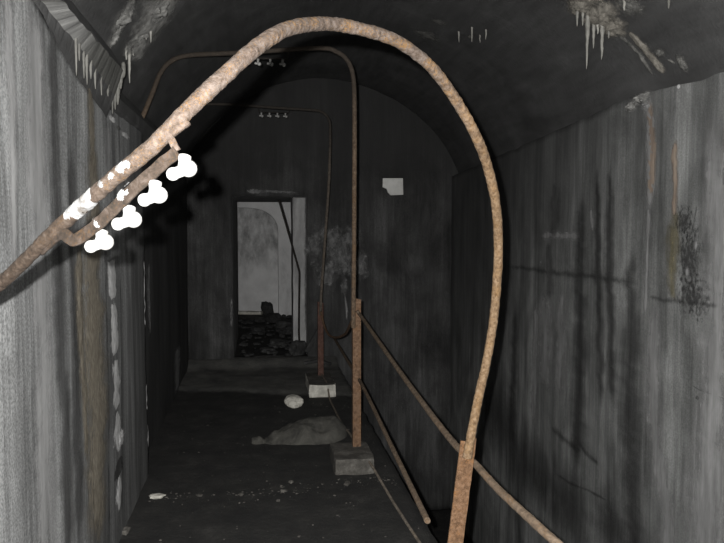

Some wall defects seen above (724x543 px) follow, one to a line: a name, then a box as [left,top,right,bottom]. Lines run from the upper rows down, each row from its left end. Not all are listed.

damp [616,32,688,74]
rust [644,101,656,312]
flaking render [107,259,124,510]
damp [646,310,674,543]
damp [685,132,724,543]